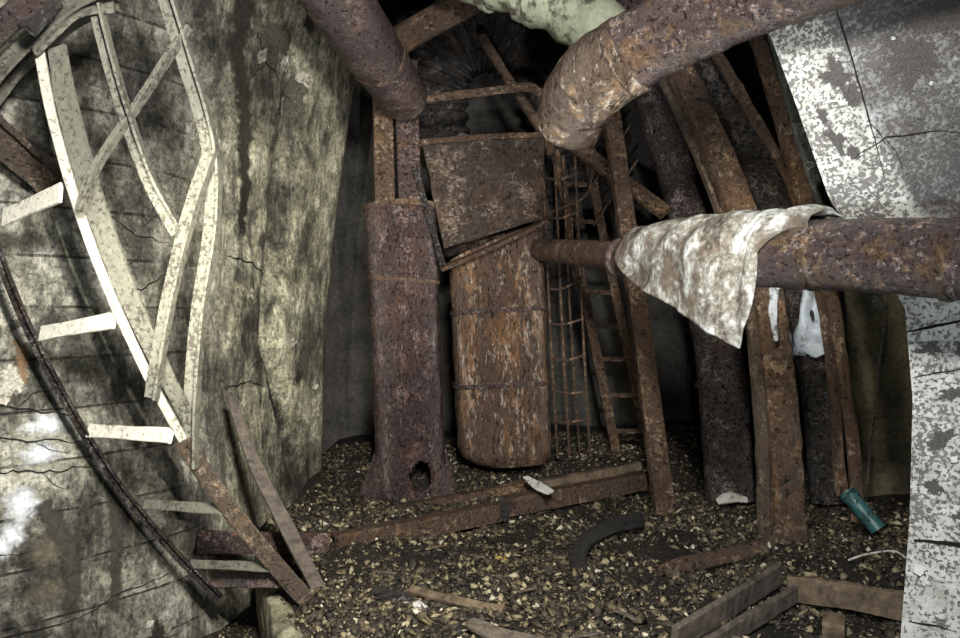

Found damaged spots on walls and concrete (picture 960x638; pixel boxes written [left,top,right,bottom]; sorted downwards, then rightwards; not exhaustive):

crack [836,9,960,177]
water stain [229,30,253,240]
crack [0,390,68,416]
water stain [24,444,57,462]
water stain [27,414,64,433]
crack [0,437,93,488]
water stain [261,357,277,420]
water stain [0,490,82,612]
crack [914,539,960,547]
crack [2,569,177,638]